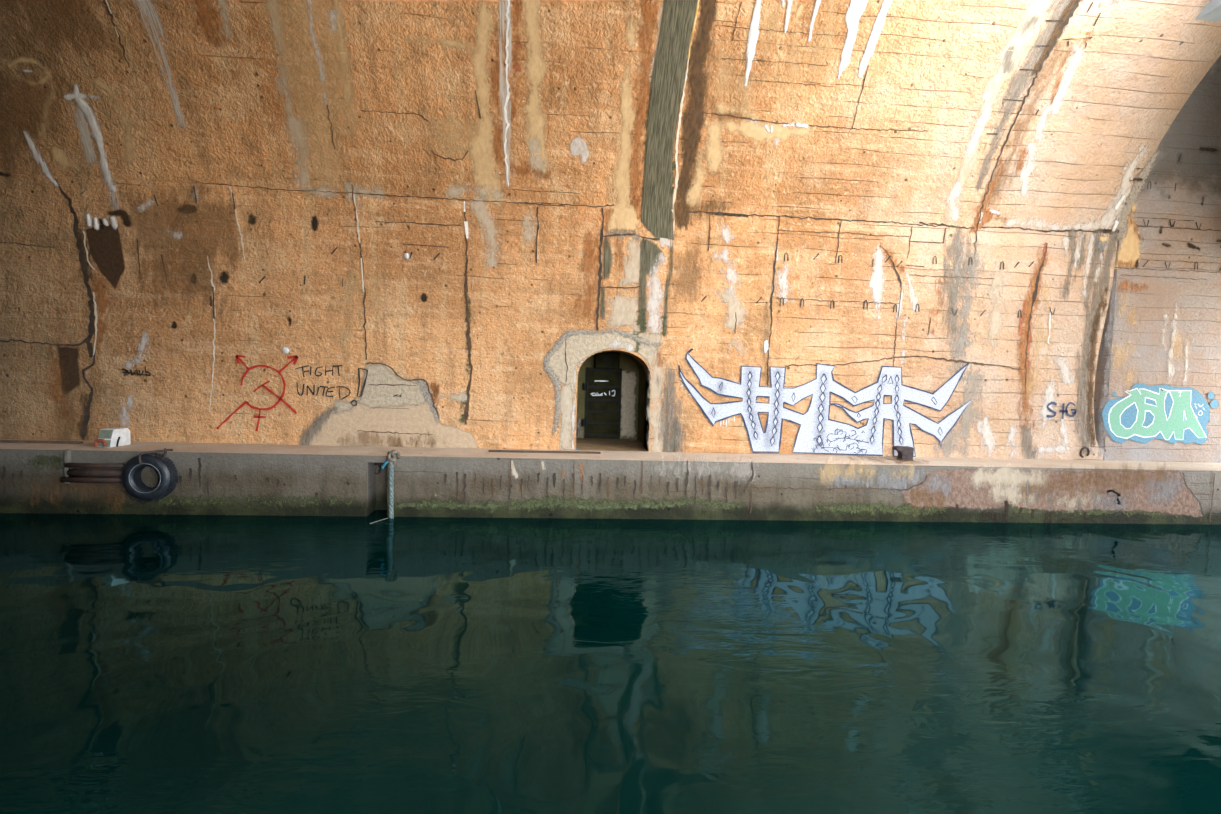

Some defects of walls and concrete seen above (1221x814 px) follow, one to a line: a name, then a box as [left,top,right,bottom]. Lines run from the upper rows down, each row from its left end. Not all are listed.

crack [0,178,106,440]
water stain [8,57,135,210]
water stain [126,334,149,369]
water stain [134,0,186,129]
spalling [299,362,478,448]
crack [200,182,641,425]
spalling [543,328,662,450]
water stain [604,0,927,452]
crack [687,0,1221,386]
water stain [935,0,1105,457]
rust [1019,243,1048,459]